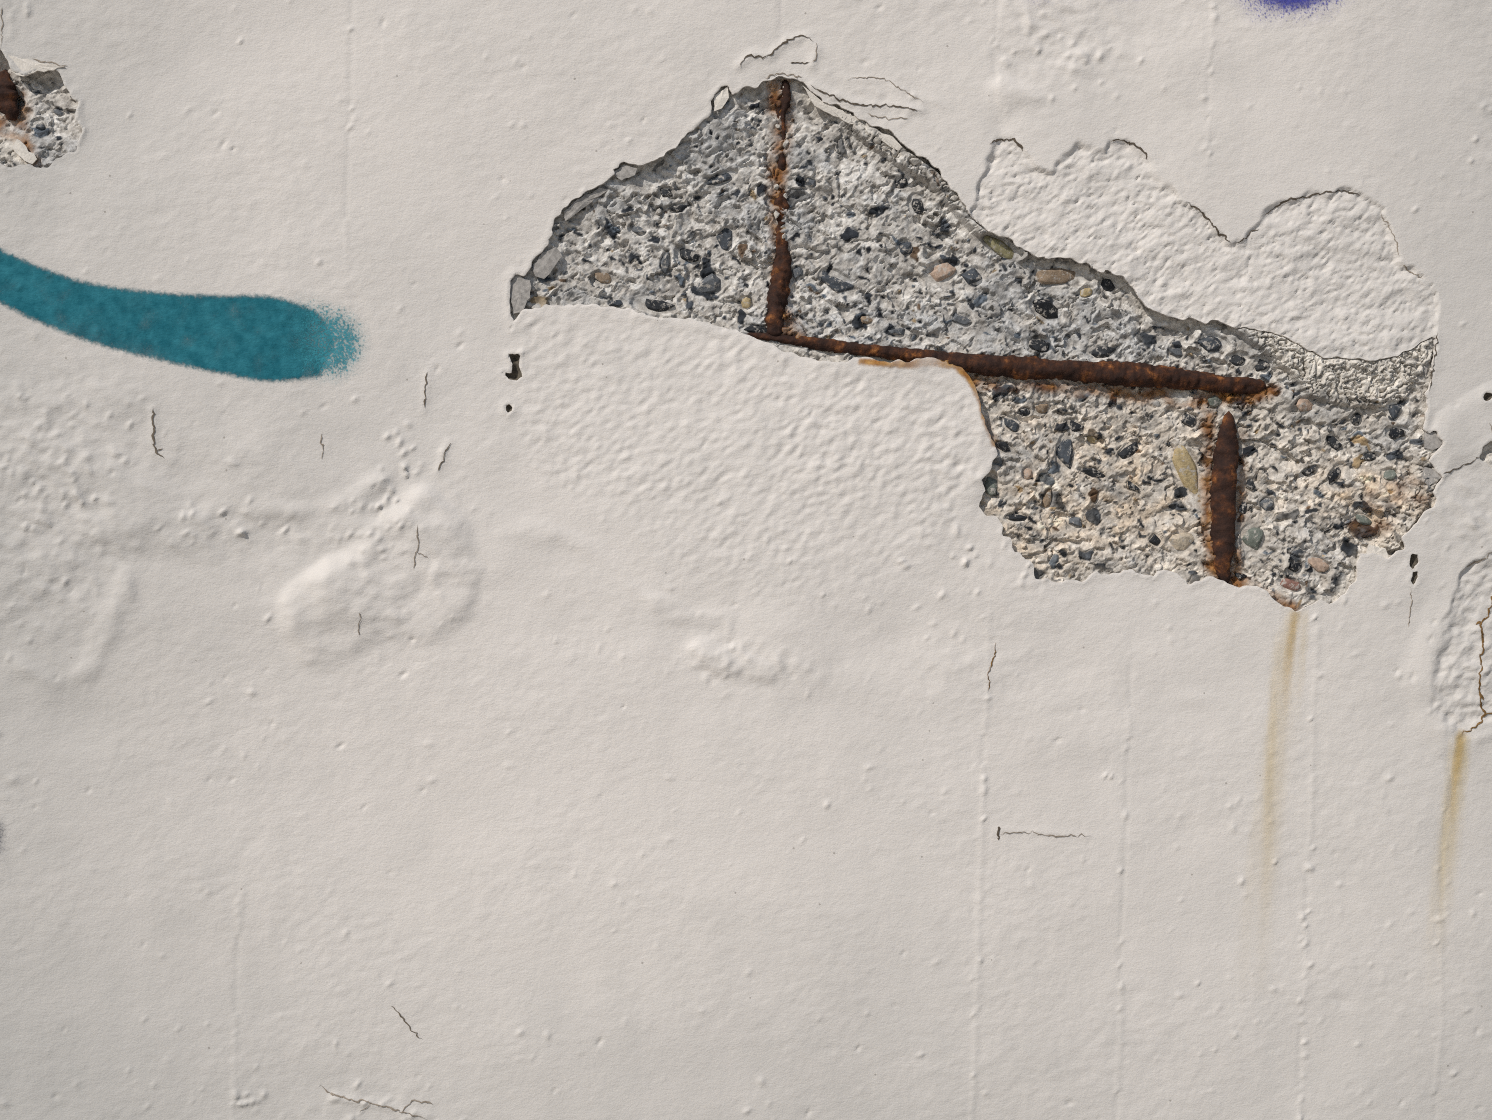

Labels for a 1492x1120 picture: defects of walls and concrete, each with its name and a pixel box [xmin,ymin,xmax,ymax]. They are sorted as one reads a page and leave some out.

spalling [0,51,82,168]
spalling [505,354,522,380]
corrosion [859,359,913,367]
corrosion [941,362,996,446]
spalling [510,77,1442,611]
corrosion [1089,386,1166,399]
corrosion [1192,386,1277,438]
spalling [1480,441,1492,469]
corrosion [1203,475,1244,587]
crack [1462,596,1492,734]
corrosion [1455,738,1464,780]